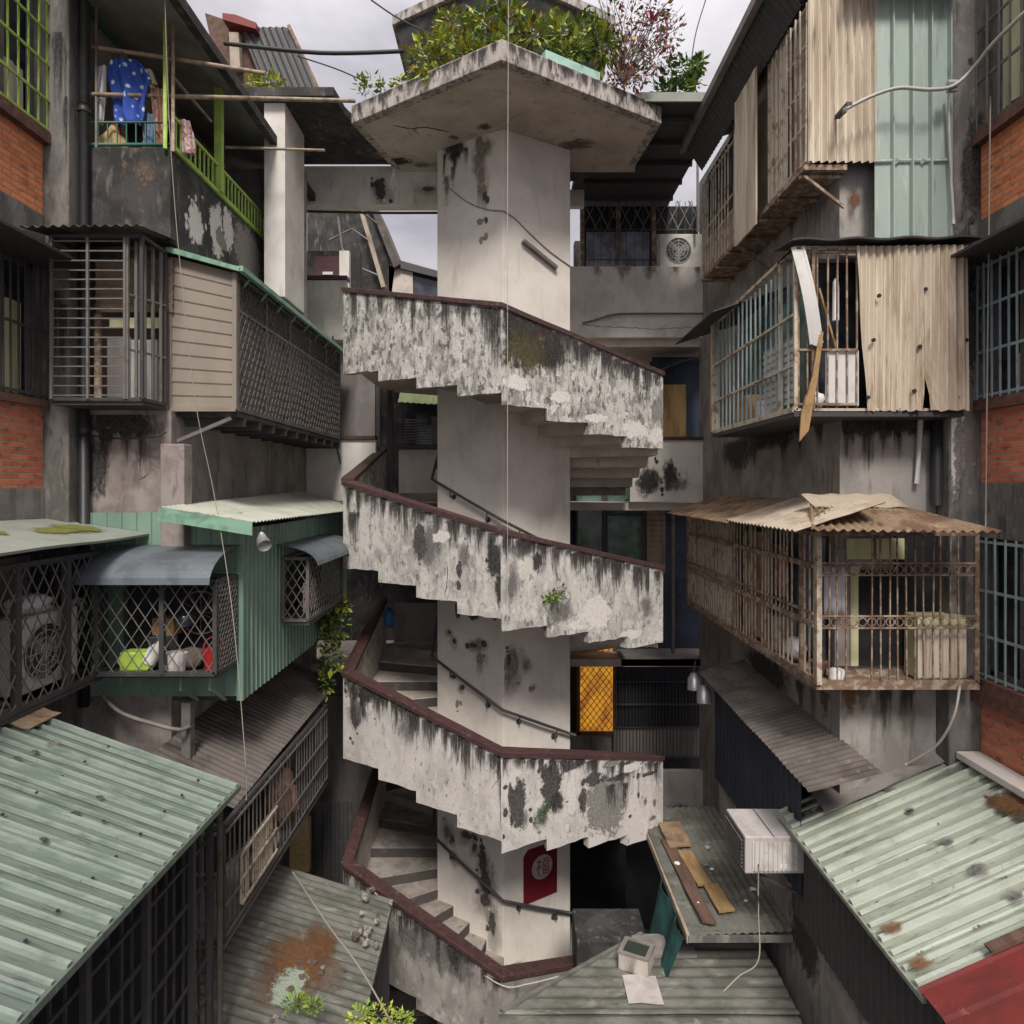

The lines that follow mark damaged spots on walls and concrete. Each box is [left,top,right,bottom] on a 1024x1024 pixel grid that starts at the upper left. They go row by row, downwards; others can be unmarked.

peeling [185,194,264,280]
leakage [350,293,382,324]
leakage [395,297,661,397]
leakage [90,415,157,498]
leakage [635,457,686,498]
leakage [345,488,662,615]
corrosion [746,651,829,715]
leakage [344,679,661,795]
corrosion [983,794,1024,822]
corrosion [255,924,343,1009]
corrosion [880,921,901,934]
corrosion [909,956,936,970]